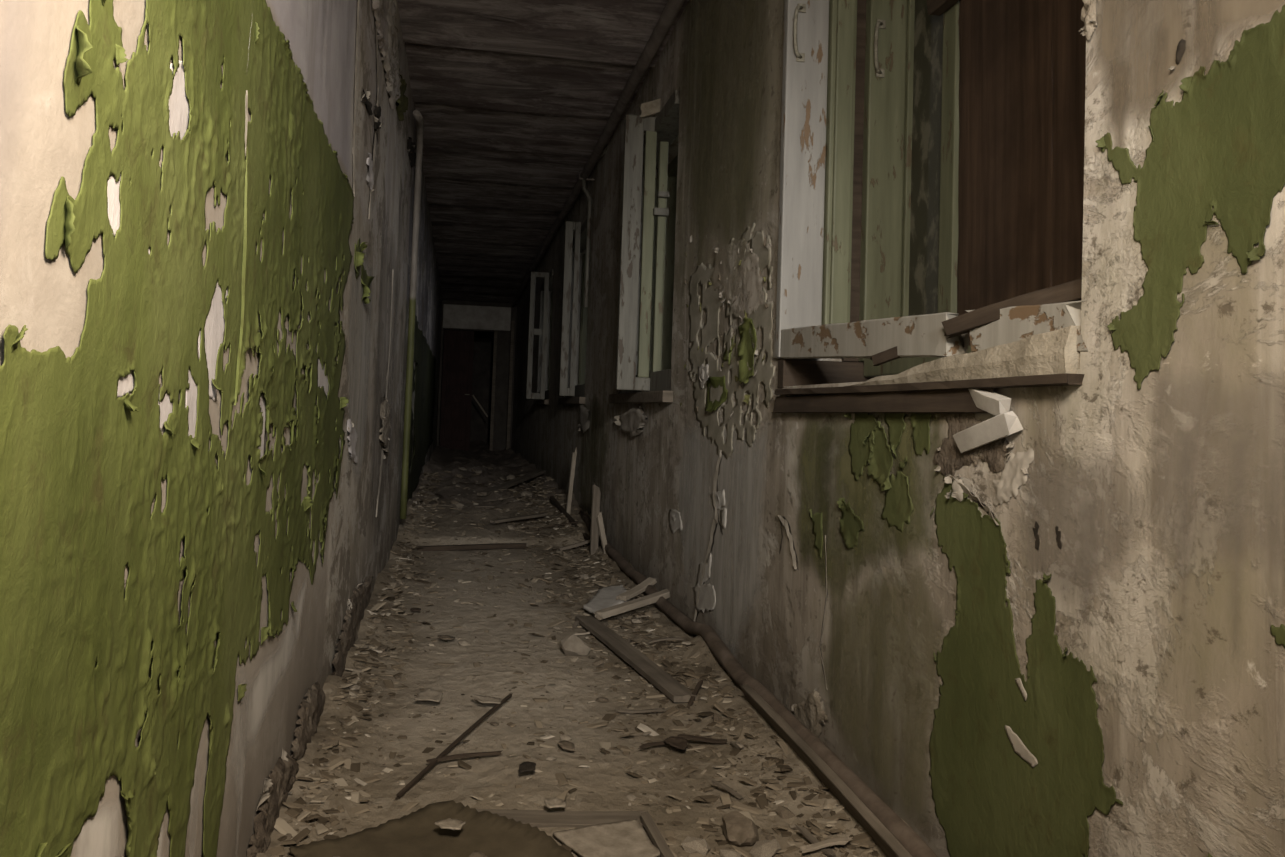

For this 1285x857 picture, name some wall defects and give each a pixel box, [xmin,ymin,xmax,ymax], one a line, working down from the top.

peeling [1095,5,1285,390]
peeling [0,0,375,857]
peeling [693,553,716,613]
peeling [711,489,727,528]
peeling [680,222,775,459]
peeling [836,498,864,549]
peeling [844,413,1123,857]
peeling [1270,624,1285,648]